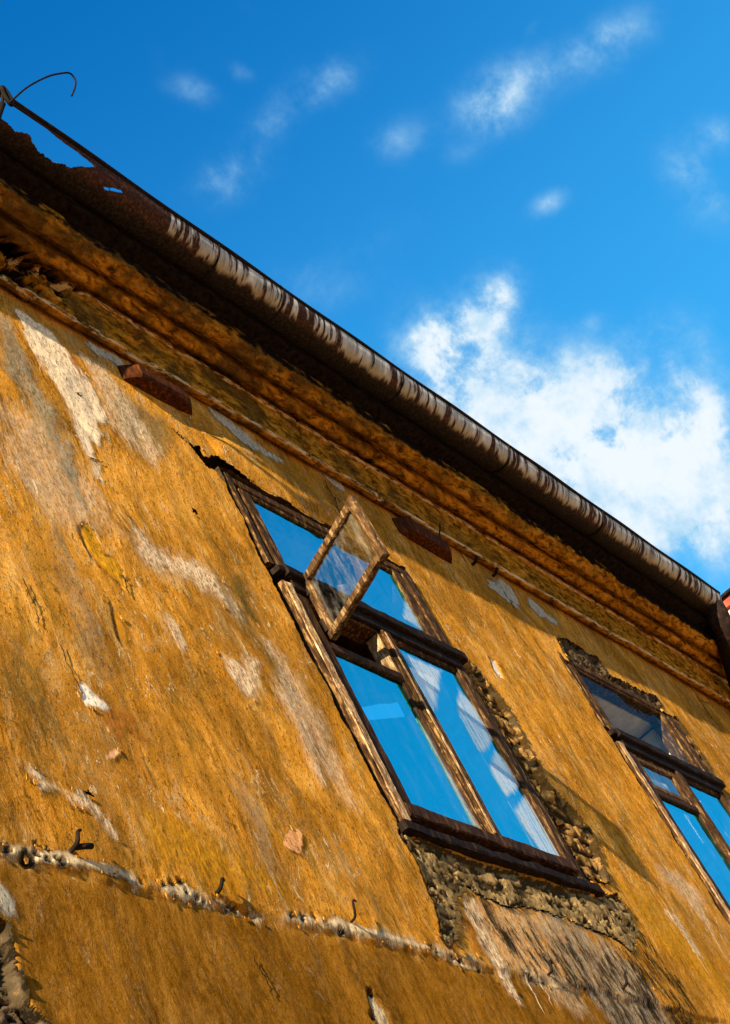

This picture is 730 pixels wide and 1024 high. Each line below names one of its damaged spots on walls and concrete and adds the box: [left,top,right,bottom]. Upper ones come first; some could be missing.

peeling [15,309,107,484]
peeling [85,341,123,366]
spalling [0,884,49,1024]
spalling [0,839,143,891]
spalling [157,878,265,926]
spalling [282,659,668,1024]